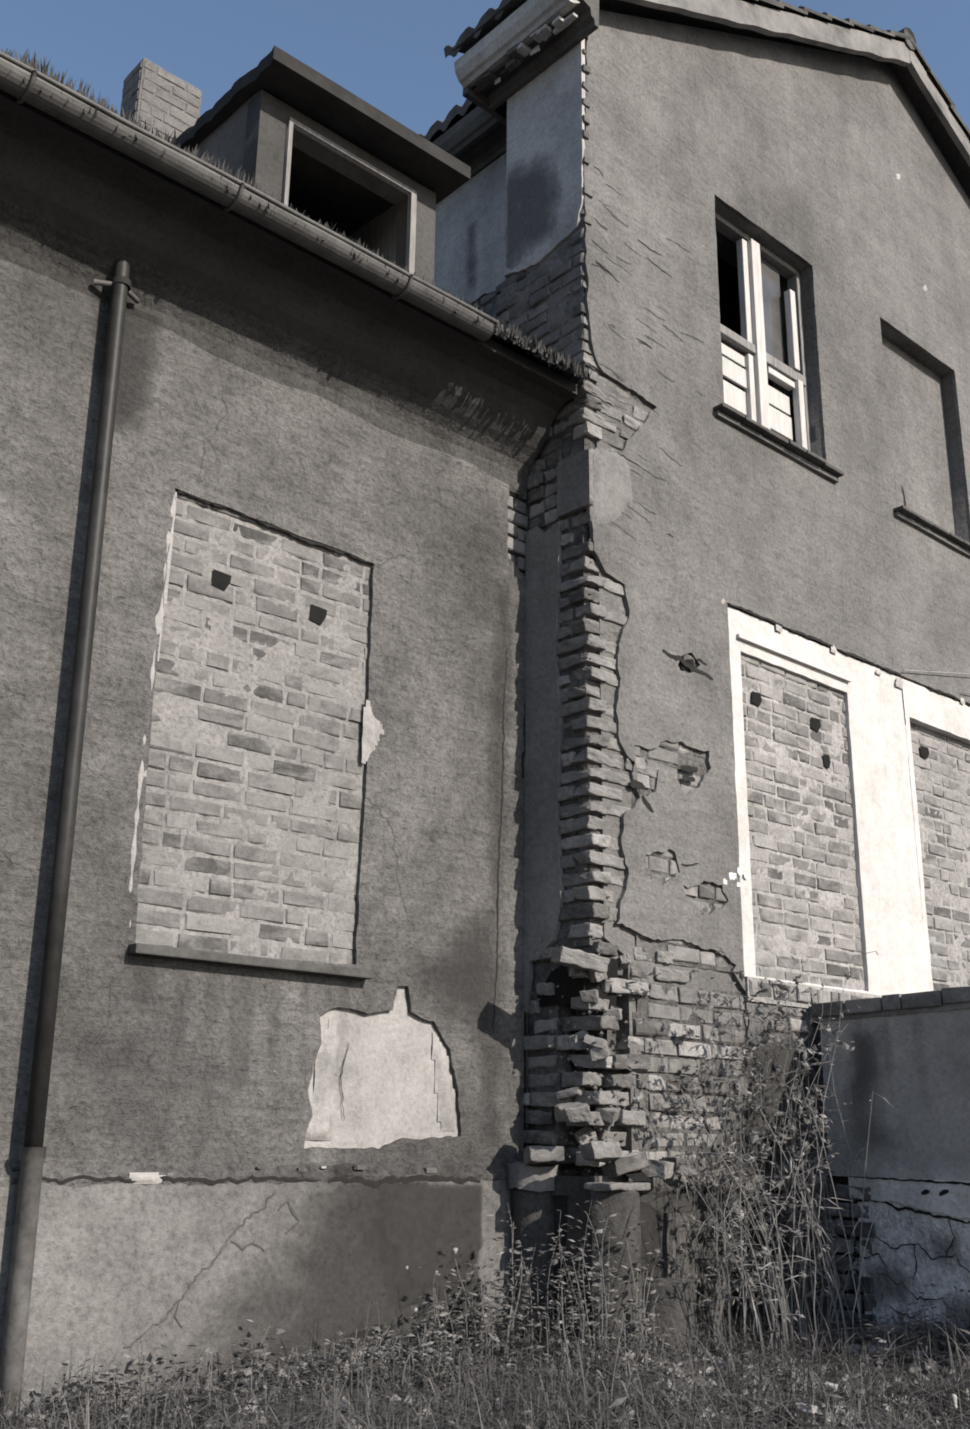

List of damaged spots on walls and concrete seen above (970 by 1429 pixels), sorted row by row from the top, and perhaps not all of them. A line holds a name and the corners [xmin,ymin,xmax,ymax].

leakage [507,168,554,267]
spalling [470,186,713,922]
peeling [304,986,458,1149]
flaking render [635,933,734,972]
flaking render [645,850,727,914]
flaking render [627,981,748,1161]
flaking render [766,1010,810,1046]
crack [10,1165,481,1348]